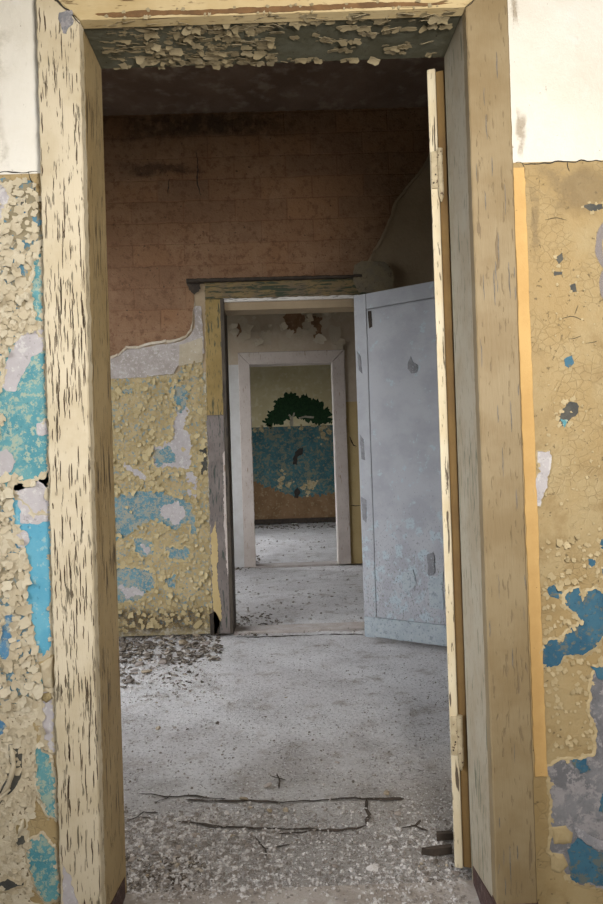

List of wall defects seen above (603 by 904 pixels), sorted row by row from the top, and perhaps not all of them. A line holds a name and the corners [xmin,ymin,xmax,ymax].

peeling [40,10,80,164]
peeling [100,0,455,70]
flaking render [103,107,430,359]
peeling [0,166,98,904]
peeling [111,358,212,633]
peeling [533,396,587,508]
crack [130,774,404,859]
peeling [540,522,603,891]